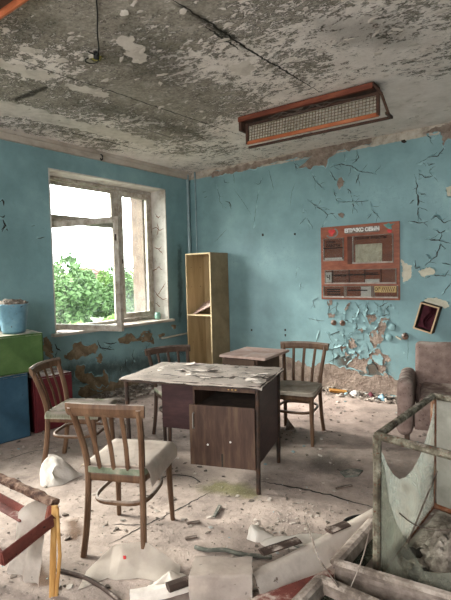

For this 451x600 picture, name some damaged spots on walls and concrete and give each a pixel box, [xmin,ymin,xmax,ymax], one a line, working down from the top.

peeling [0,46,116,98]
peeling [110,35,149,64]
peeling [198,20,238,45]
crack [173,0,319,92]
peeling [0,101,223,161]
crack [408,134,451,295]
peeling [401,259,437,284]
peeling [424,297,450,309]
peeling [64,339,139,398]
peeling [118,329,165,346]
peeling [279,299,399,396]
crack [263,481,371,507]